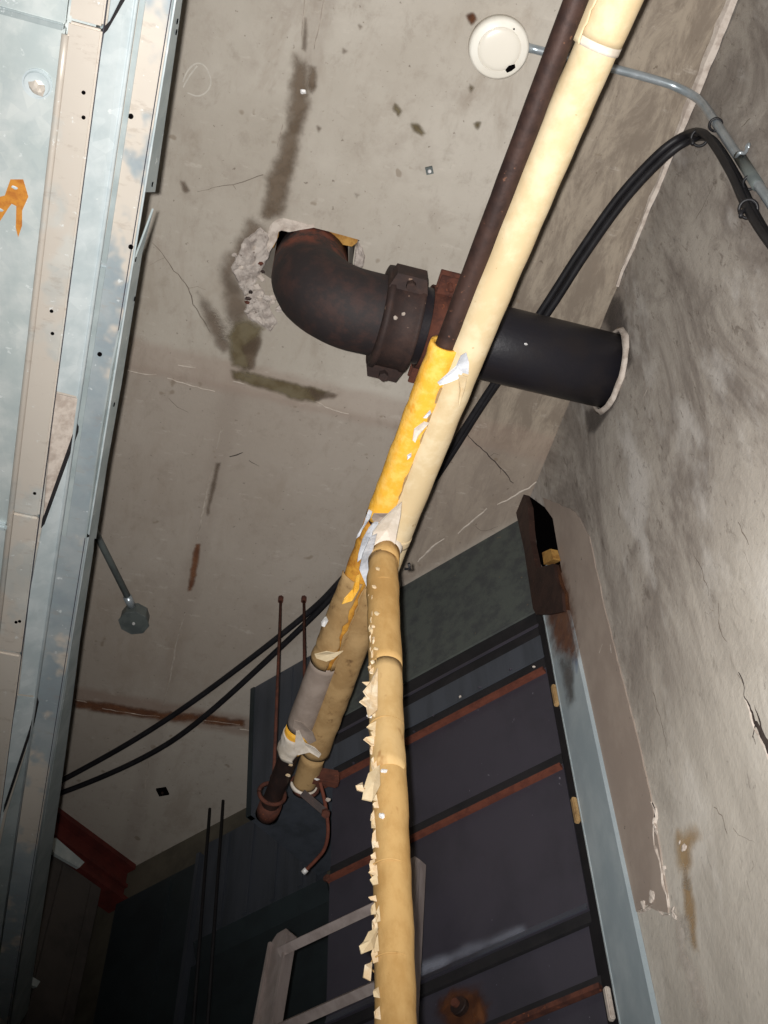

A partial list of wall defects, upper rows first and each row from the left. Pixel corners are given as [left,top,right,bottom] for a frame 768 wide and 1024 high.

water stain [206,58,335,401]
spalling [231,218,314,332]
spalling [354,241,365,268]
rust [189,544,200,590]
rust [549,575,578,698]
crack [738,672,768,760]
peeling [638,802,677,920]